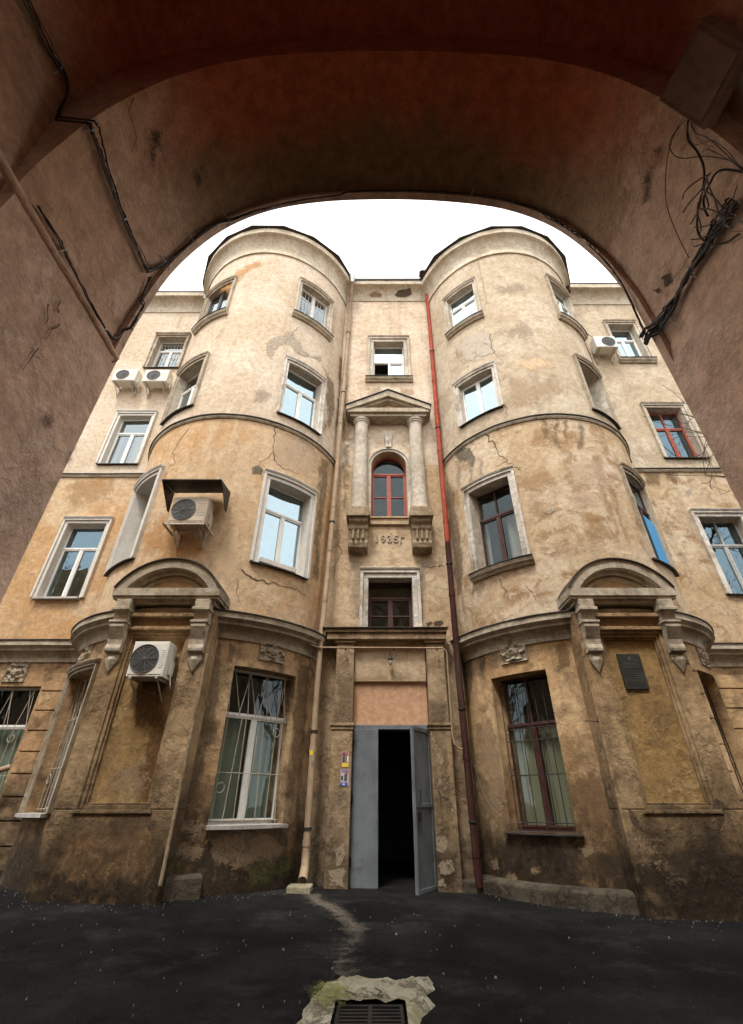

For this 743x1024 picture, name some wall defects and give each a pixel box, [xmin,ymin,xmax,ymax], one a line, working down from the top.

peeling [395,288,412,297]
flaking render [266,332,322,361]
crack [236,569,305,599]
water stain [556,644,570,669]
water stain [292,665,307,772]
water stain [490,773,617,886]
flaking render [328,843,346,889]
flaking render [436,835,455,887]